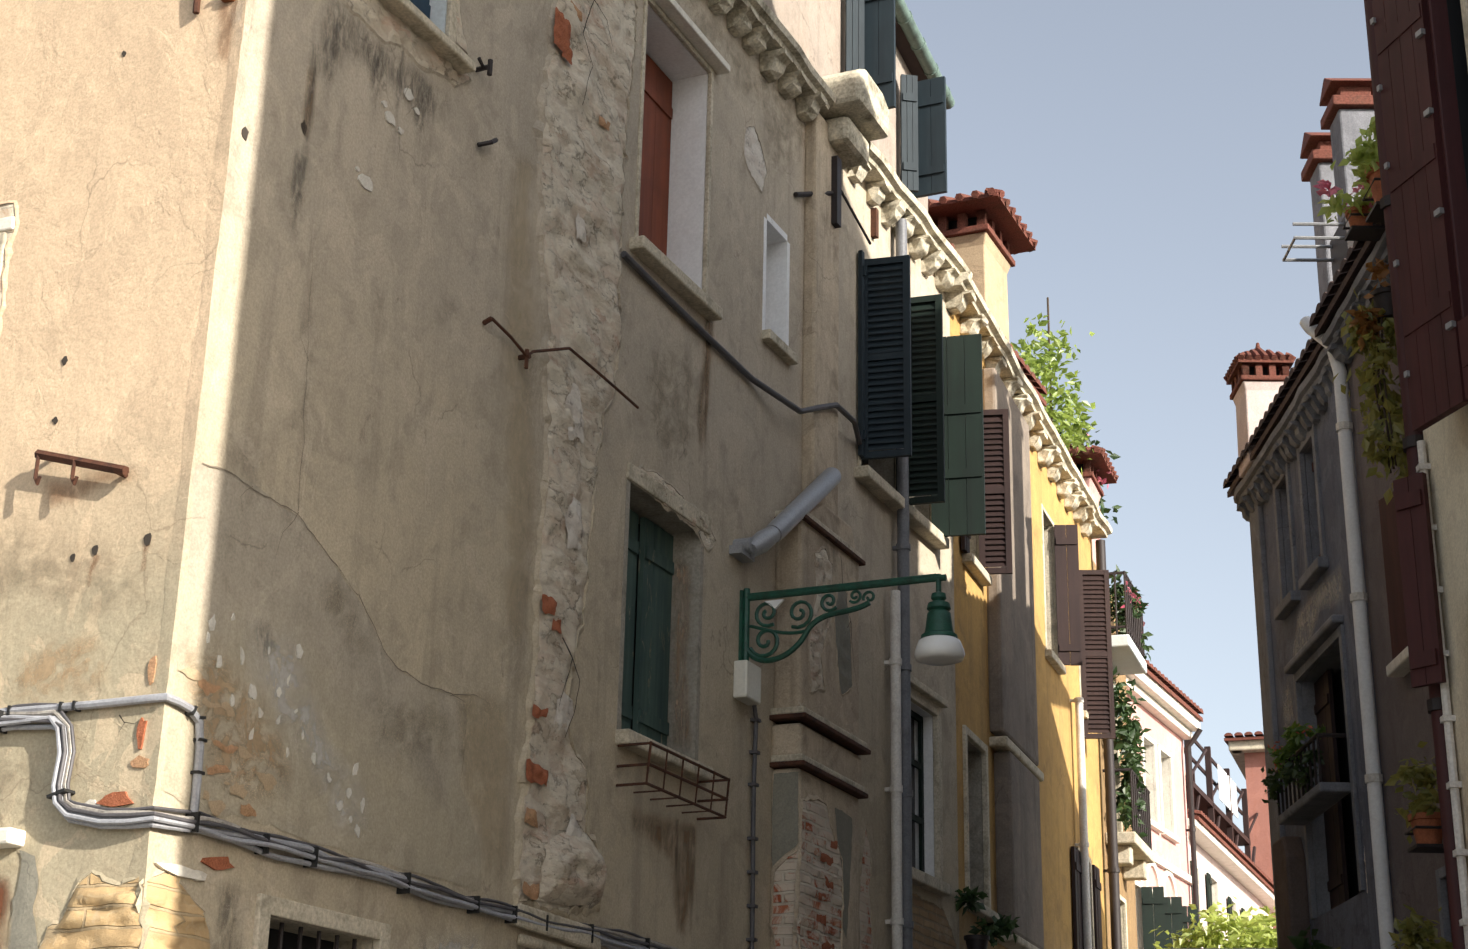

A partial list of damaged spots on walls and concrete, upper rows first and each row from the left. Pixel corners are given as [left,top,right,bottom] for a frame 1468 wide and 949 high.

spalling [0,200,20,335]
crack [202,239,490,780]
spalling [512,0,639,918]
peeling [179,613,304,817]
peeling [286,730,365,838]
spalling [38,857,235,949]
spalling [769,795,844,949]